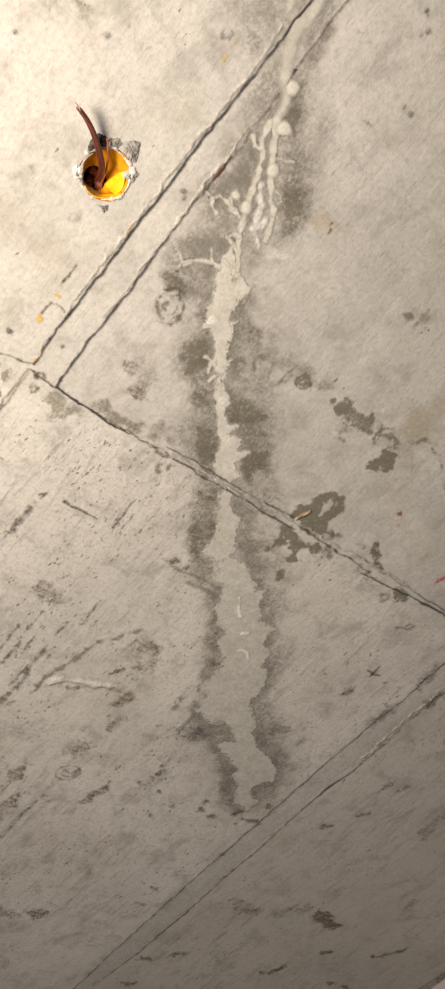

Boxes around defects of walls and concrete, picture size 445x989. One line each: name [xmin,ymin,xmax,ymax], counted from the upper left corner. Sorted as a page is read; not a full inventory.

water stain [260,82,305,144]
water stain [171,136,309,300]
water stain [181,329,216,407]
water stain [184,425,220,478]
water stain [224,355,269,480]
water stain [189,522,216,558]